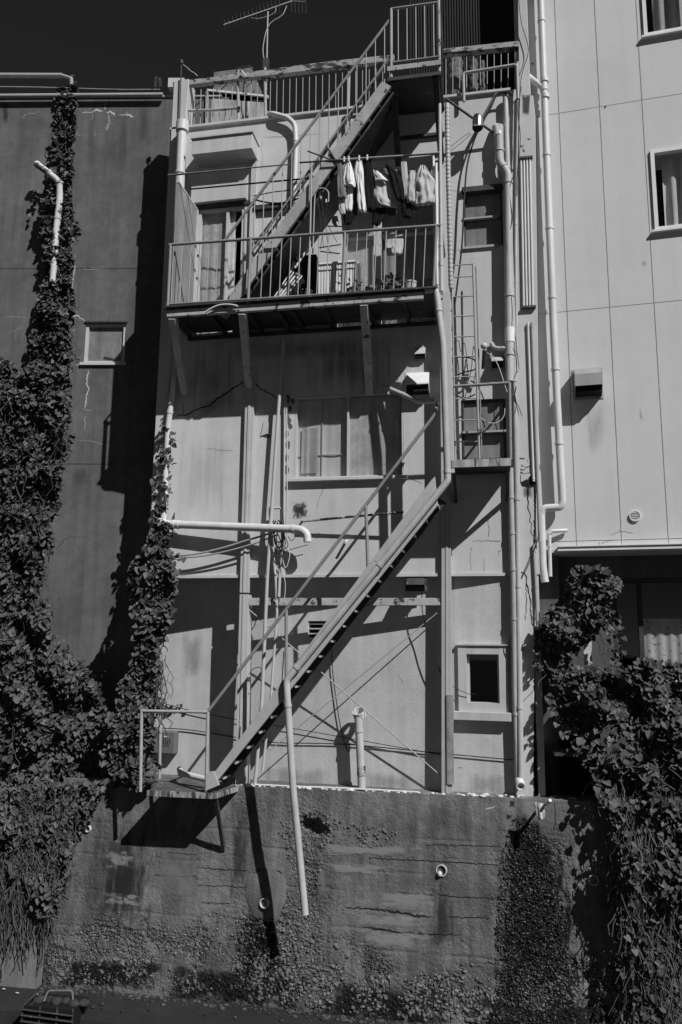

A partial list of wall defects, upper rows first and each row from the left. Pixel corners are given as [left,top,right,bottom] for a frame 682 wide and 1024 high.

crack [78,100,133,136]
crack [67,315,106,446]
crack [177,382,277,416]
water stain [495,801,579,1016]